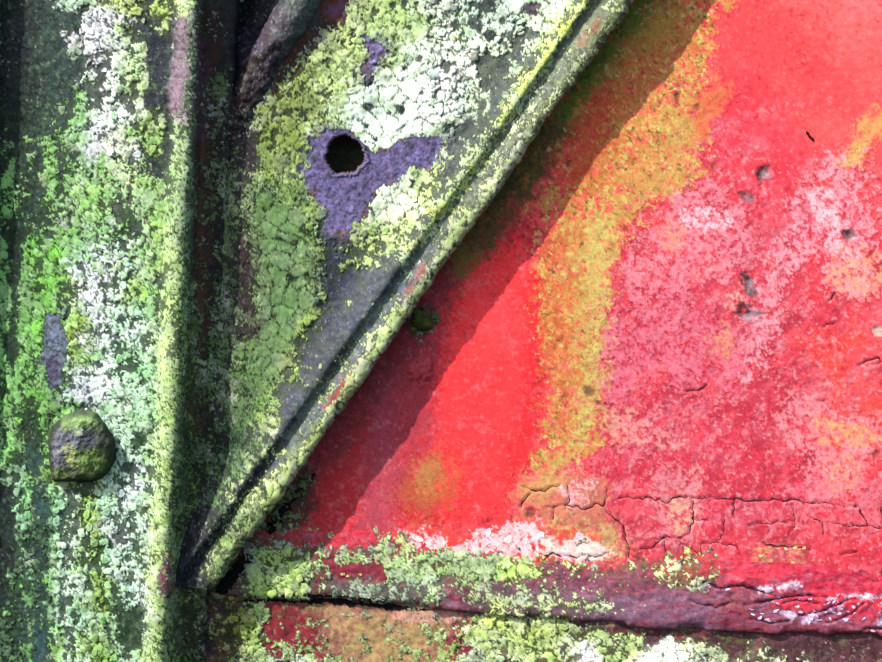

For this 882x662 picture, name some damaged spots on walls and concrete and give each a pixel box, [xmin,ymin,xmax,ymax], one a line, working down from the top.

crack [521,485,882,559]
crack [690,582,882,630]
peeling [750,578,882,632]